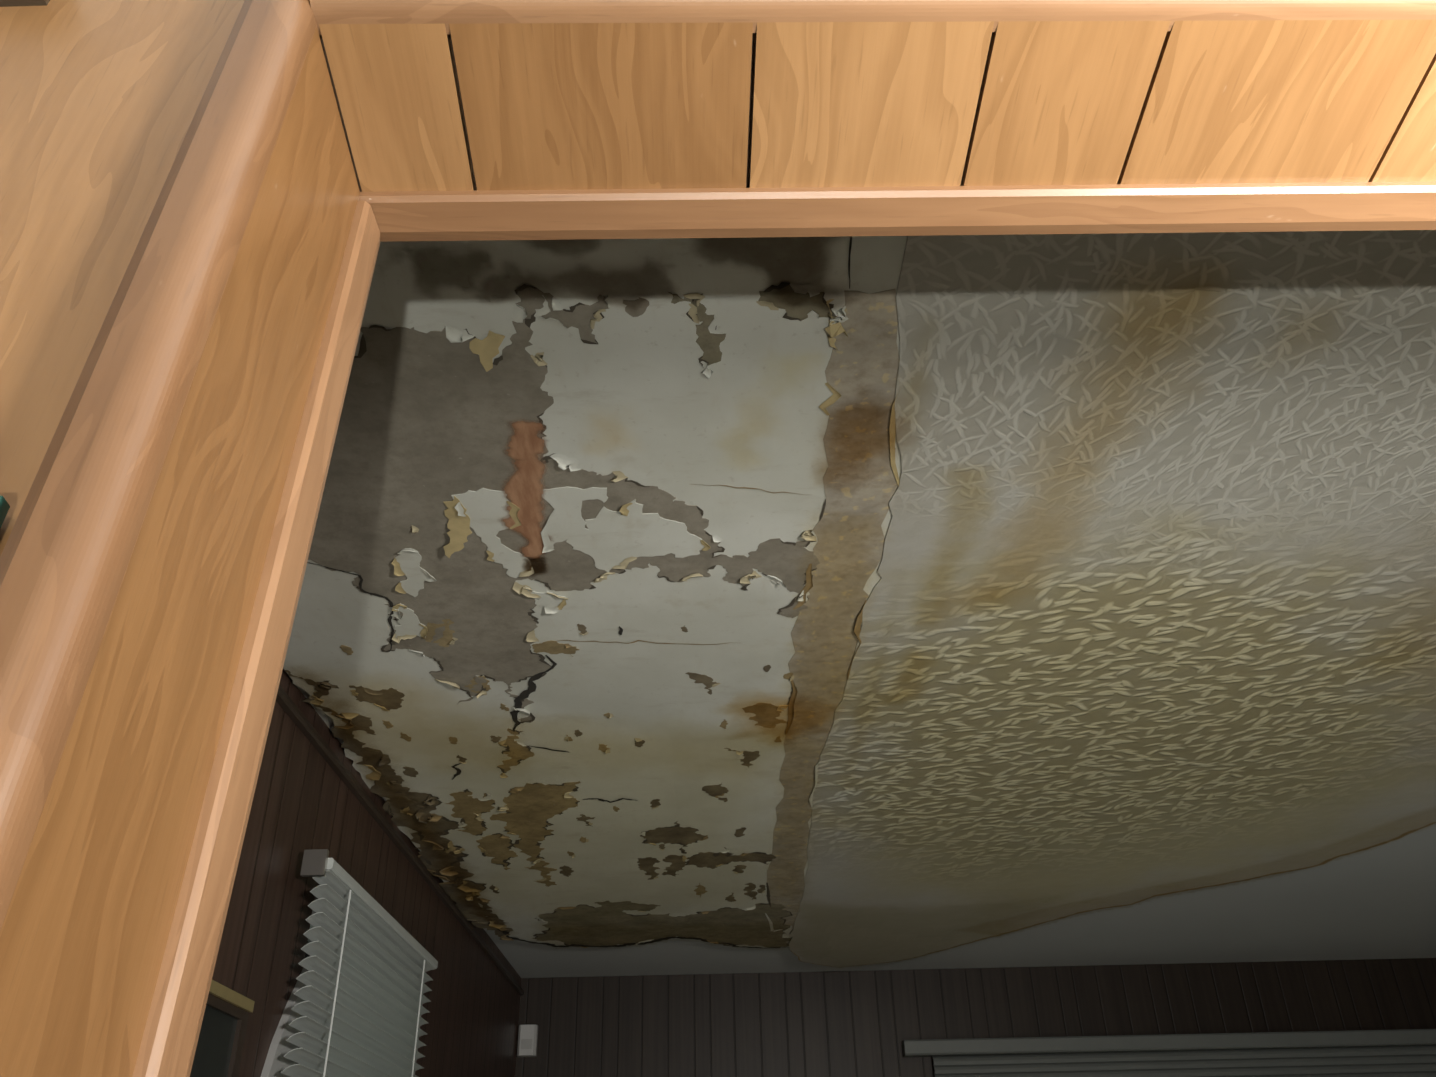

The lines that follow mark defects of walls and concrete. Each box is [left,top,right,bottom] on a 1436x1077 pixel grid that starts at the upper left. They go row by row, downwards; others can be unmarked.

peeling [285,282,900,948]
crack [510,626,726,752]